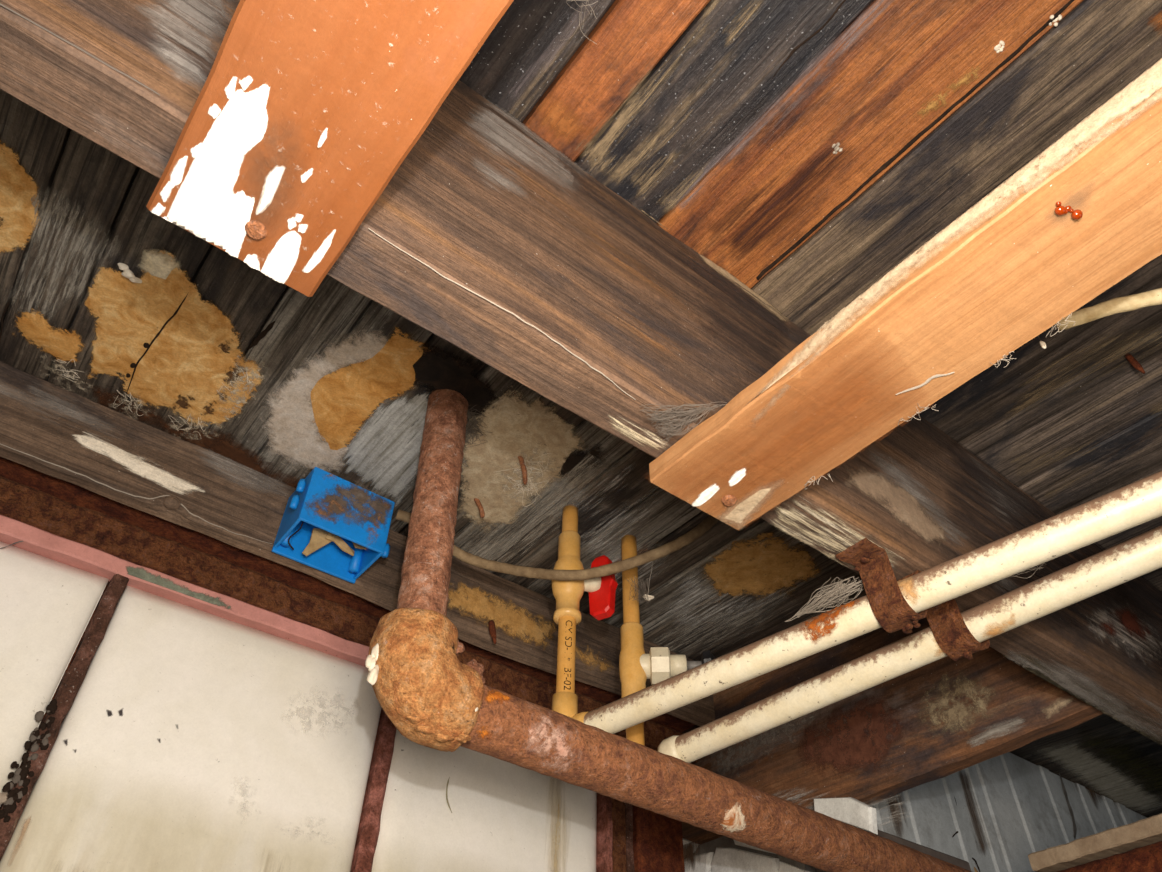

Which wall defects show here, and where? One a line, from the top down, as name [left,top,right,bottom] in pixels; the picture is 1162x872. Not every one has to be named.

peeling [151,76,336,284]
crack [126,292,189,394]
rust [365,389,972,872]
rust [985,620,1014,637]